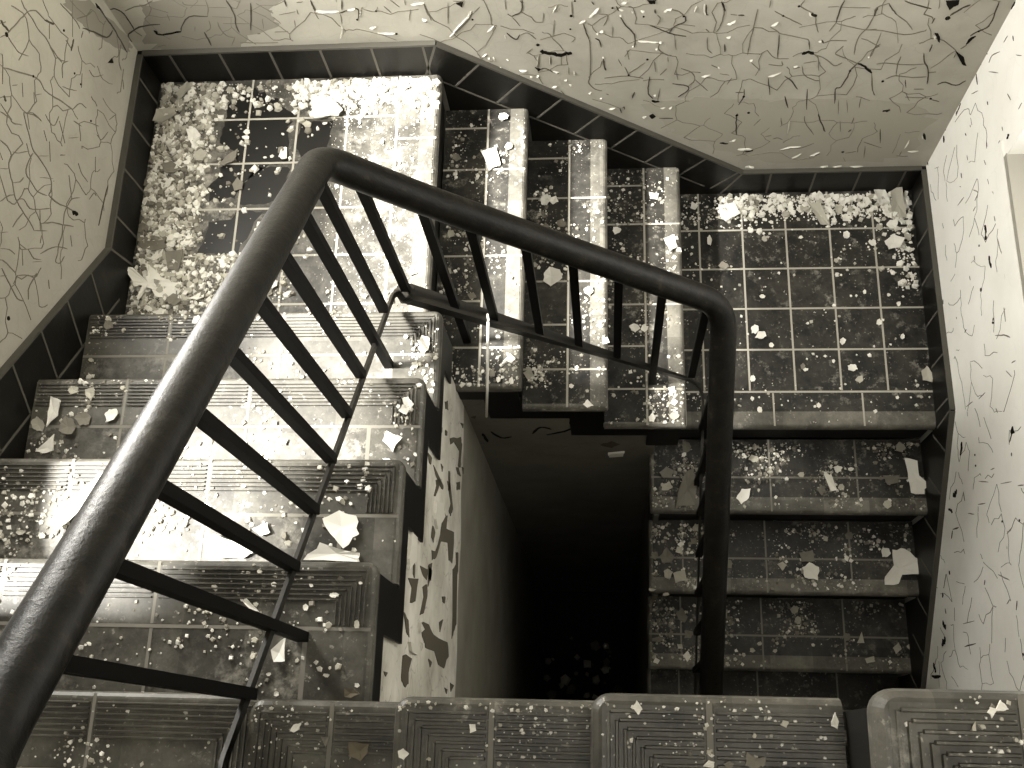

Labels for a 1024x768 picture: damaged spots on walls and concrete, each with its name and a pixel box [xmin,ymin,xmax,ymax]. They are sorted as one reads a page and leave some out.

crack [0,0,480,301]
crack [505,0,1022,278]
peeling [380,375,476,702]
crack [951,434,1023,539]